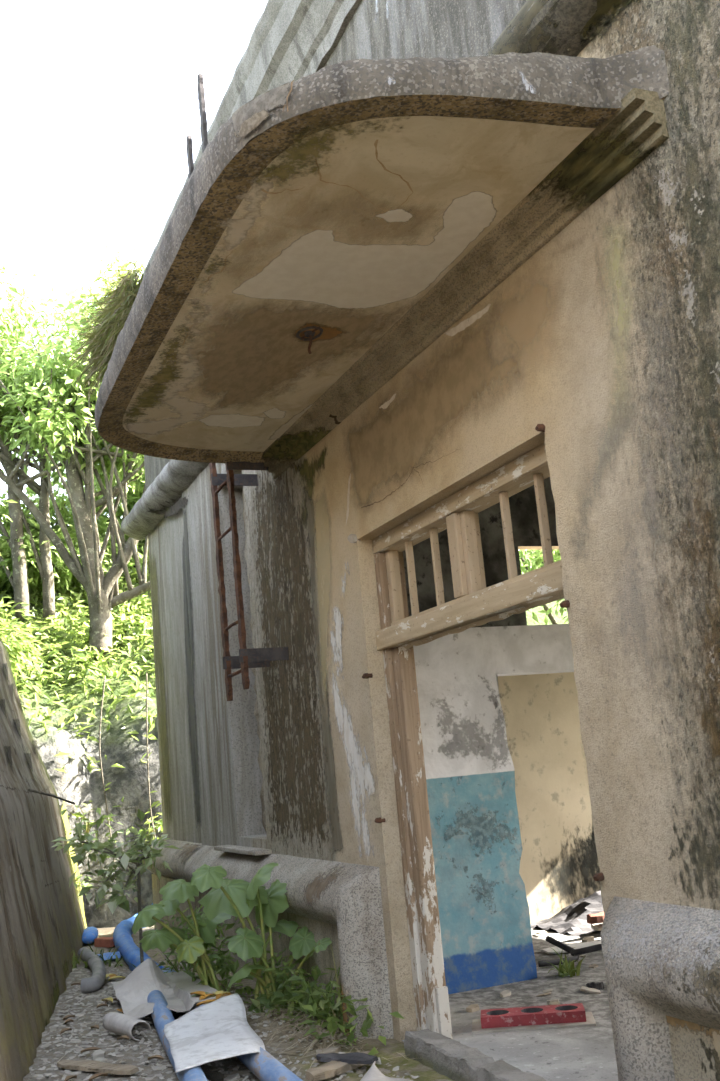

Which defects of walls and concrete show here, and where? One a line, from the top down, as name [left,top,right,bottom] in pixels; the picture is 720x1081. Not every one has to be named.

damp [127,179,401,434]
peeling [232,192,496,308]
damp [347,283,548,505]
damp [528,119,655,210]
damp [643,0,720,659]
damp [252,469,375,856]
damp [303,867,351,909]
damp [544,831,601,904]
damp [672,671,720,911]
peeling [711,1030,720,1060]